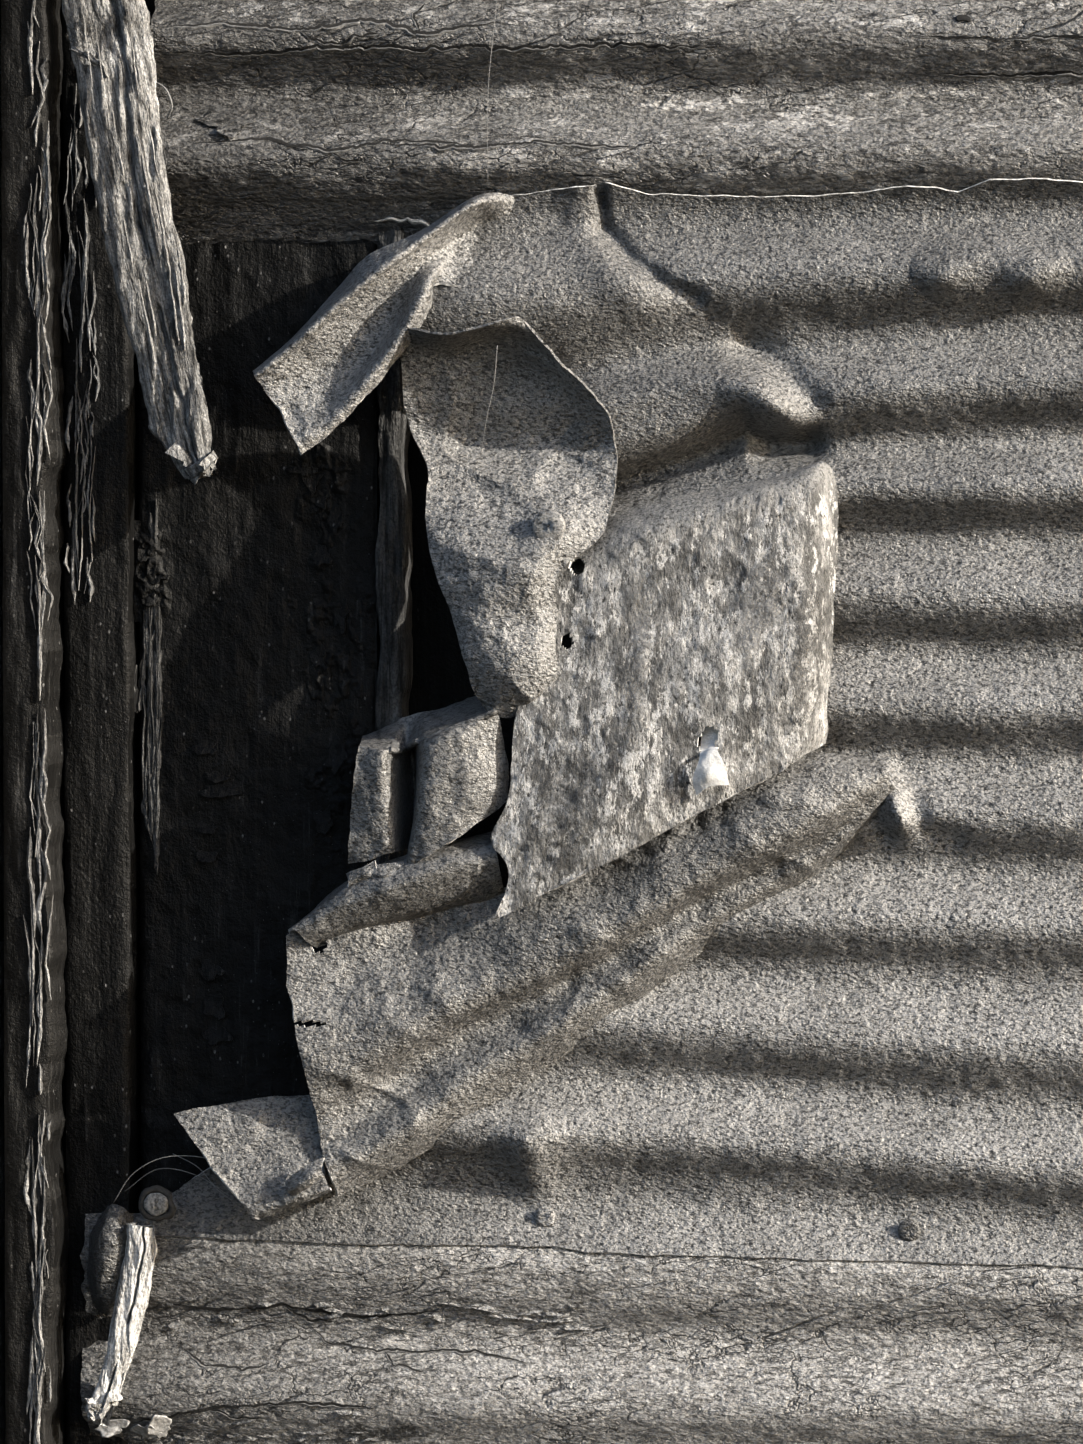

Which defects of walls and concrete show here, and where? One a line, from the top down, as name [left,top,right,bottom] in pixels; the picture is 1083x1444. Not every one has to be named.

peeling [374,217,430,227]
peeling [285,441,352,523]
peeling [314,1302,344,1319]
peeling [362,1308,412,1332]
peeling [423,1302,589,1331]
peeling [225,1410,379,1444]